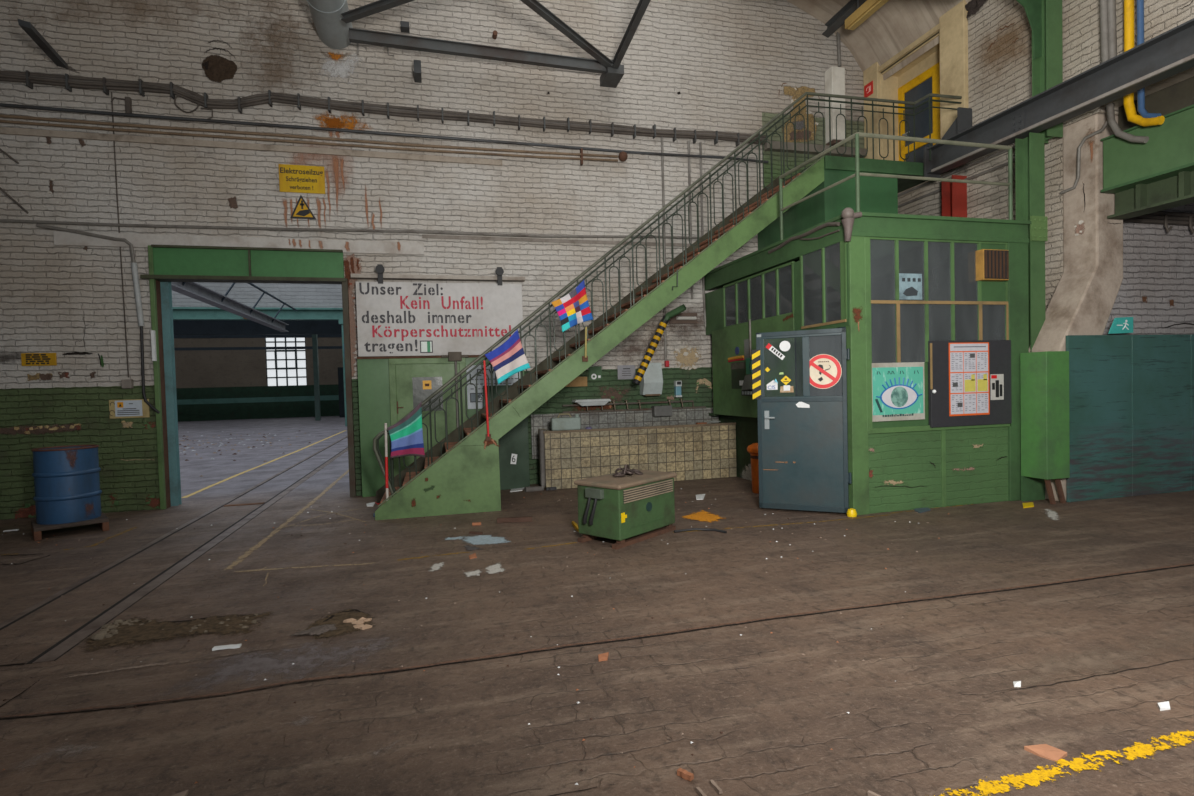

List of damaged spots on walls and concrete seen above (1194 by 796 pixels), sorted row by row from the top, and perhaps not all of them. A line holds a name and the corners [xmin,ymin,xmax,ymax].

spalling [201,40,237,82]
rust [315,113,368,138]
rust [283,153,345,248]
rust [365,187,382,229]
peeling [323,609,372,630]